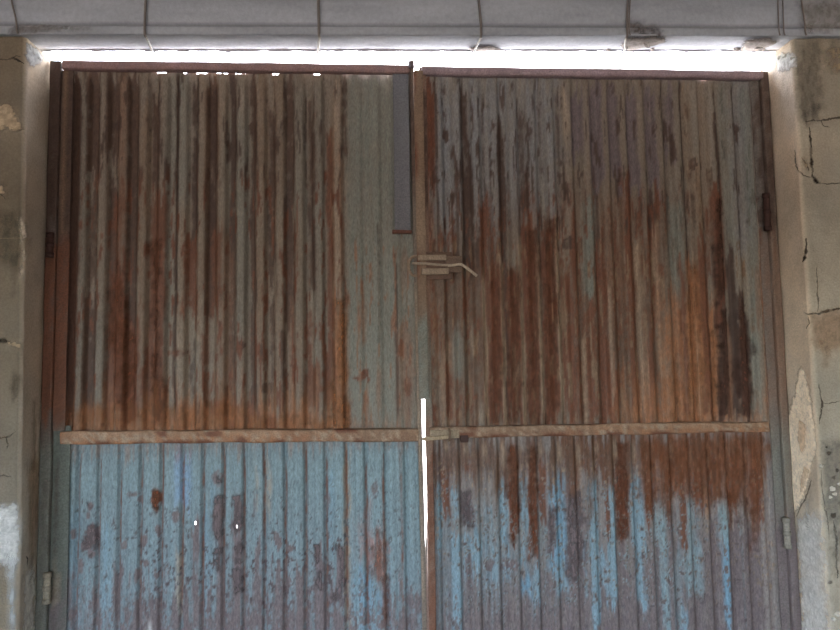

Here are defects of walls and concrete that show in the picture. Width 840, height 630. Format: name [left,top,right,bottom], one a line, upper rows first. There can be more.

flaking render [0,104,23,131]
crack [795,117,840,185]
crack [802,238,840,329]
peeling [789,368,840,556]